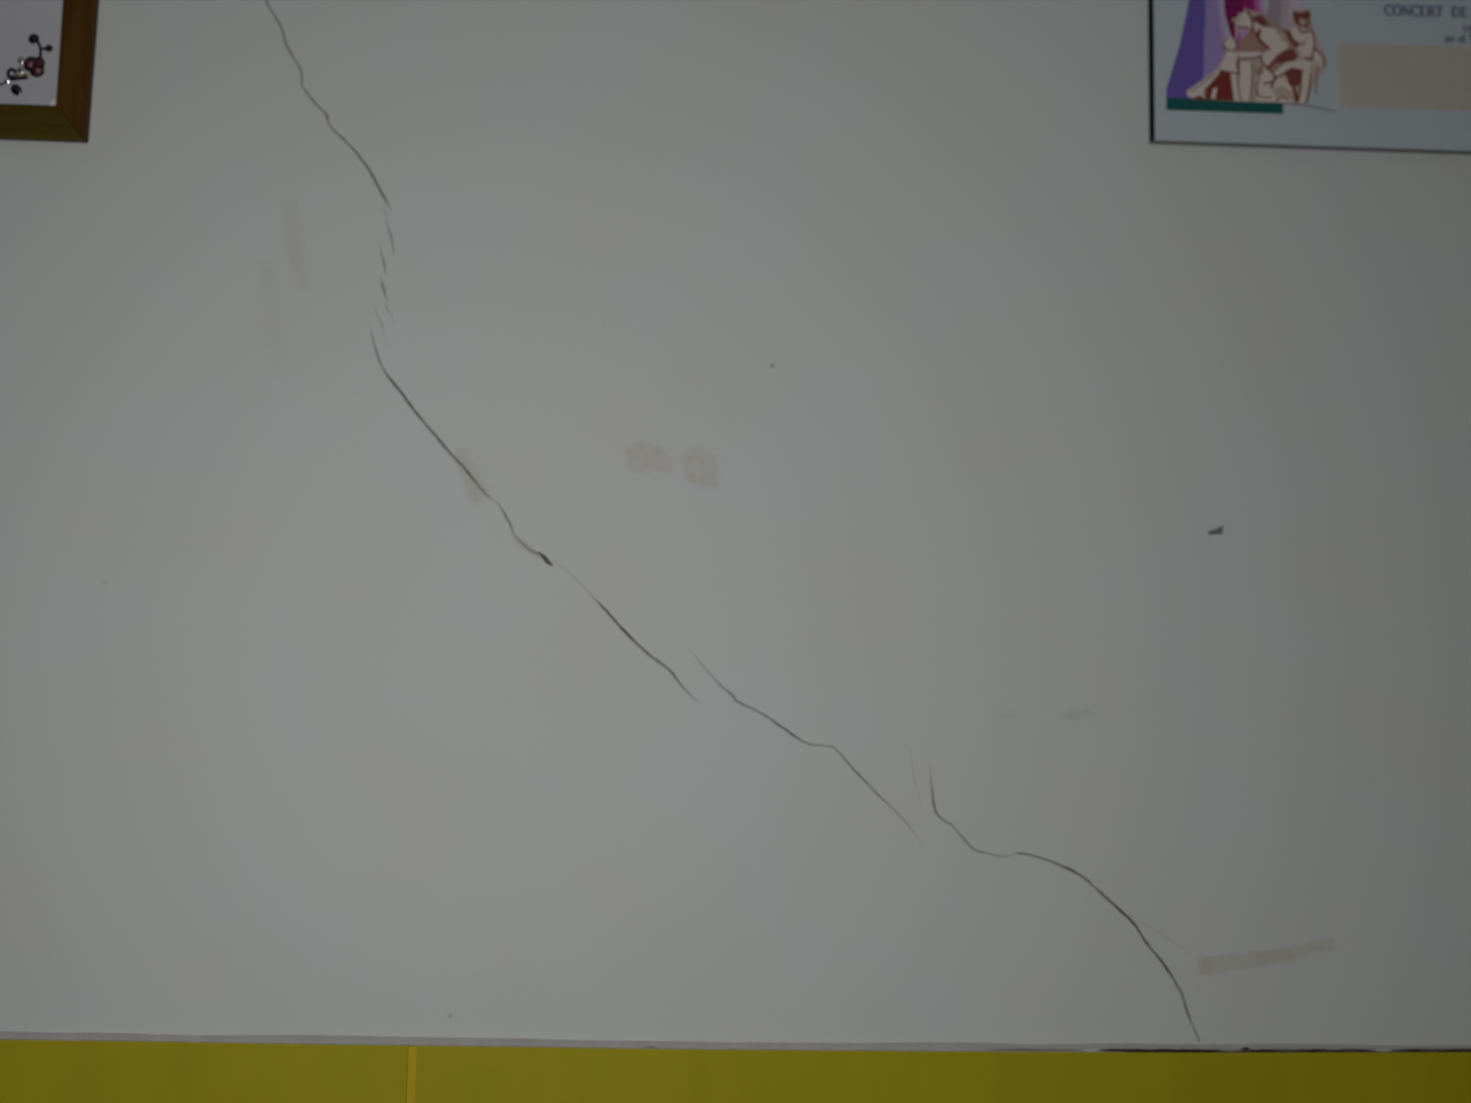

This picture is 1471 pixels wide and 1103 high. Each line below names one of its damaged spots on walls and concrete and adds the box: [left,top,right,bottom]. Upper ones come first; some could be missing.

crack [265,0,1471,1052]